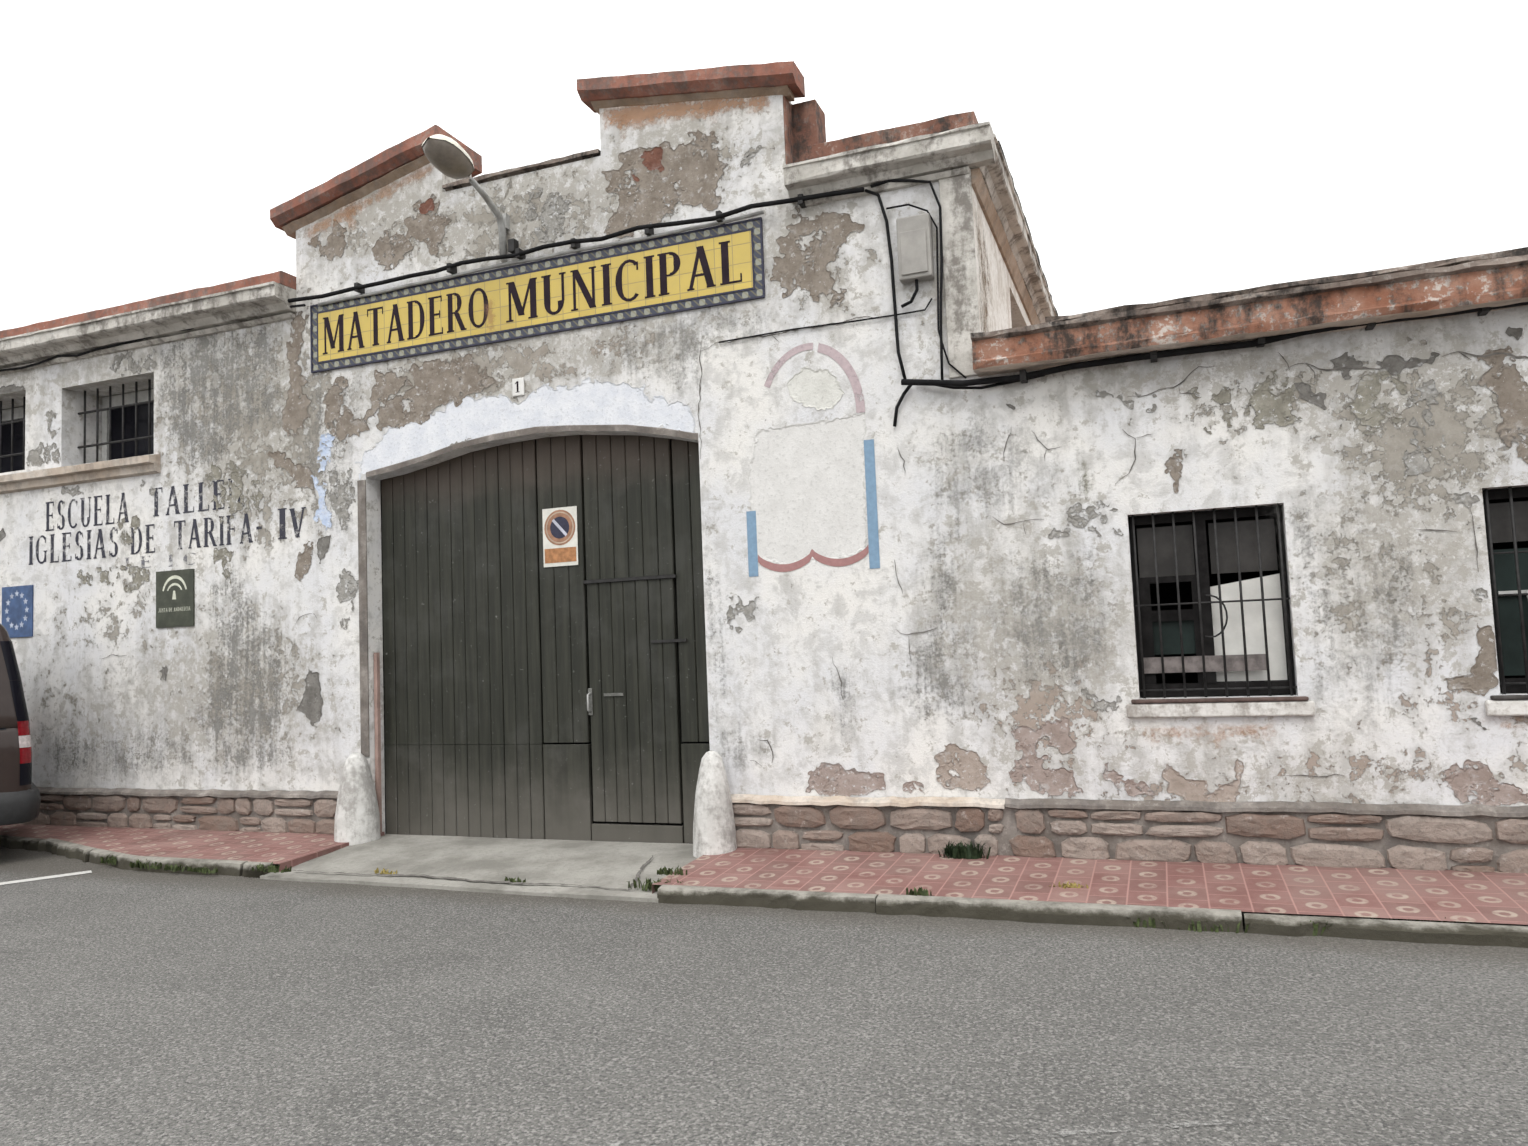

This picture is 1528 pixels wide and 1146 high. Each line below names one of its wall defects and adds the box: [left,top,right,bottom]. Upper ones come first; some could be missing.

flaking render [601,130,762,238]
flaking render [308,219,347,261]
flaking render [371,194,451,270]
flaking render [770,206,865,308]
flaking render [1477,327,1528,464]
flaking render [297,669,323,726]
flaking render [805,743,990,797]
flaking render [1009,716,1083,798]
flaking render [1102,759,1244,802]
flaking render [1442,759,1528,806]